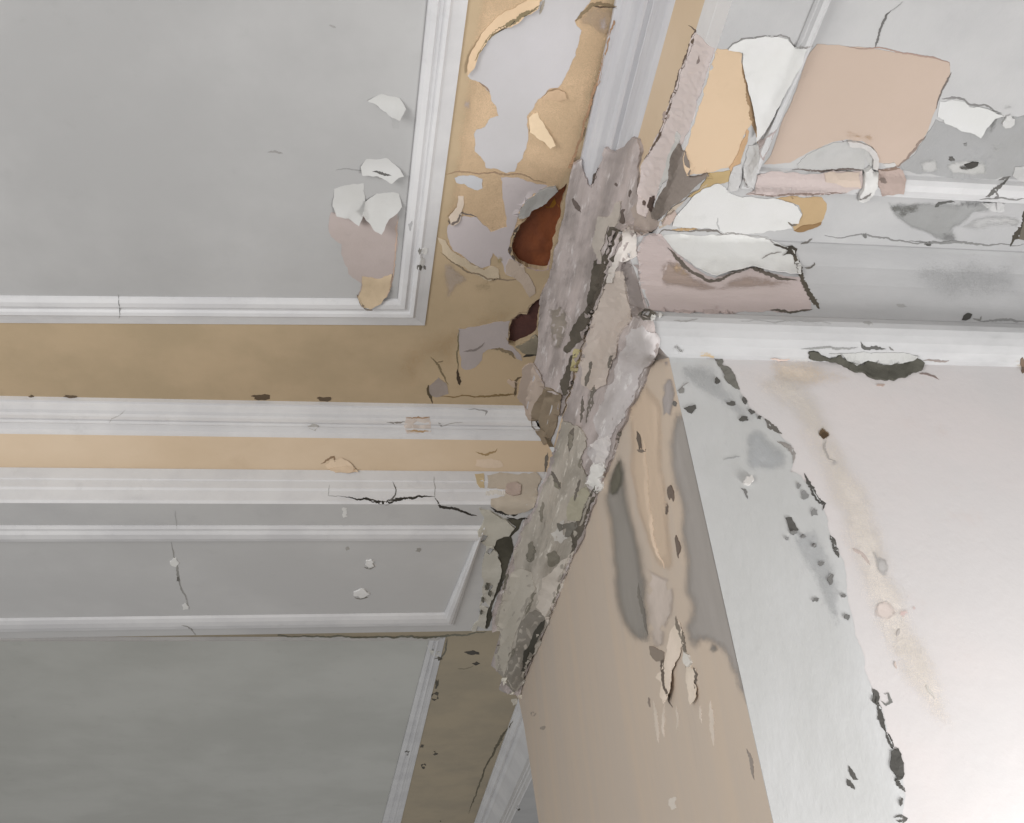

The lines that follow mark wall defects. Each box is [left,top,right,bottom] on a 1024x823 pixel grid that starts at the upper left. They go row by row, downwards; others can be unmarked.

peeling [368,94,406,129]
peeling [328,158,413,311]
peeling [417,247,428,270]
flaking render [427,0,1024,823]
crack [170,516,196,635]
crack [328,483,527,520]
water stain [715,342,954,730]